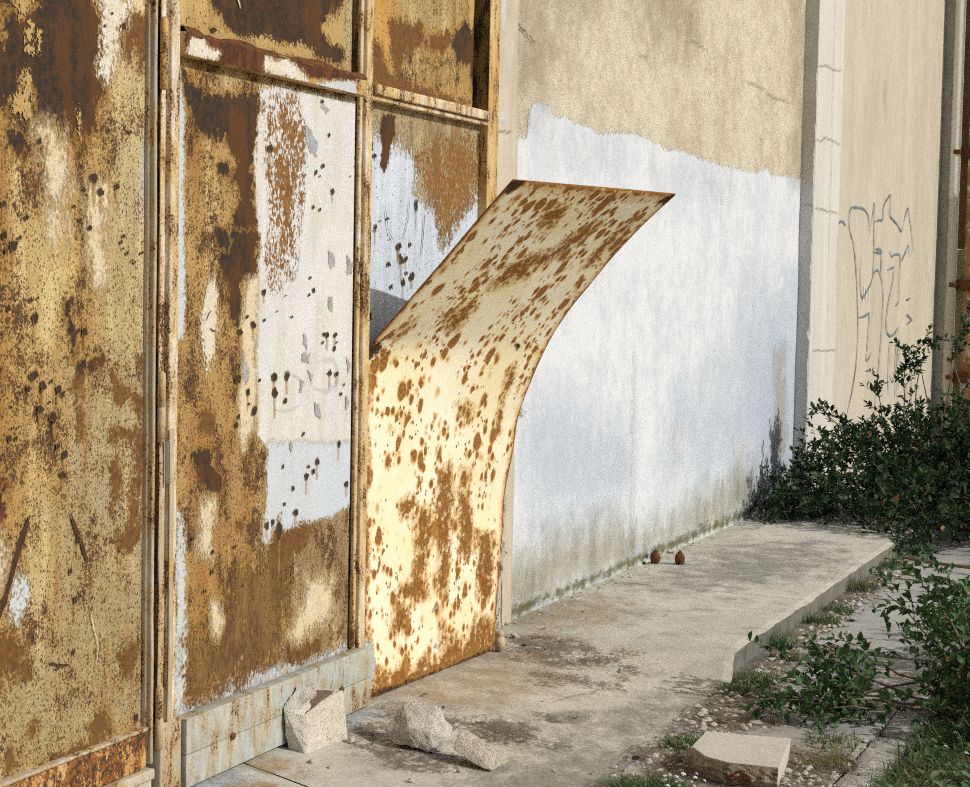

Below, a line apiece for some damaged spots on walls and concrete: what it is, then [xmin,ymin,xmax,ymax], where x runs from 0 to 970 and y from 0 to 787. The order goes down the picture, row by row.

corrosion [0,0,110,163]
corrosion [180,0,474,105]
corrosion [180,66,307,339]
peeling [235,33,357,545]
corrosion [487,220,601,292]
corrosion [63,293,143,553]
corrosion [191,444,223,500]
corrosion [493,361,517,441]
water stain [749,344,788,462]
corrosion [179,512,322,710]
corrosion [371,459,496,698]
water stain [629,541,848,592]